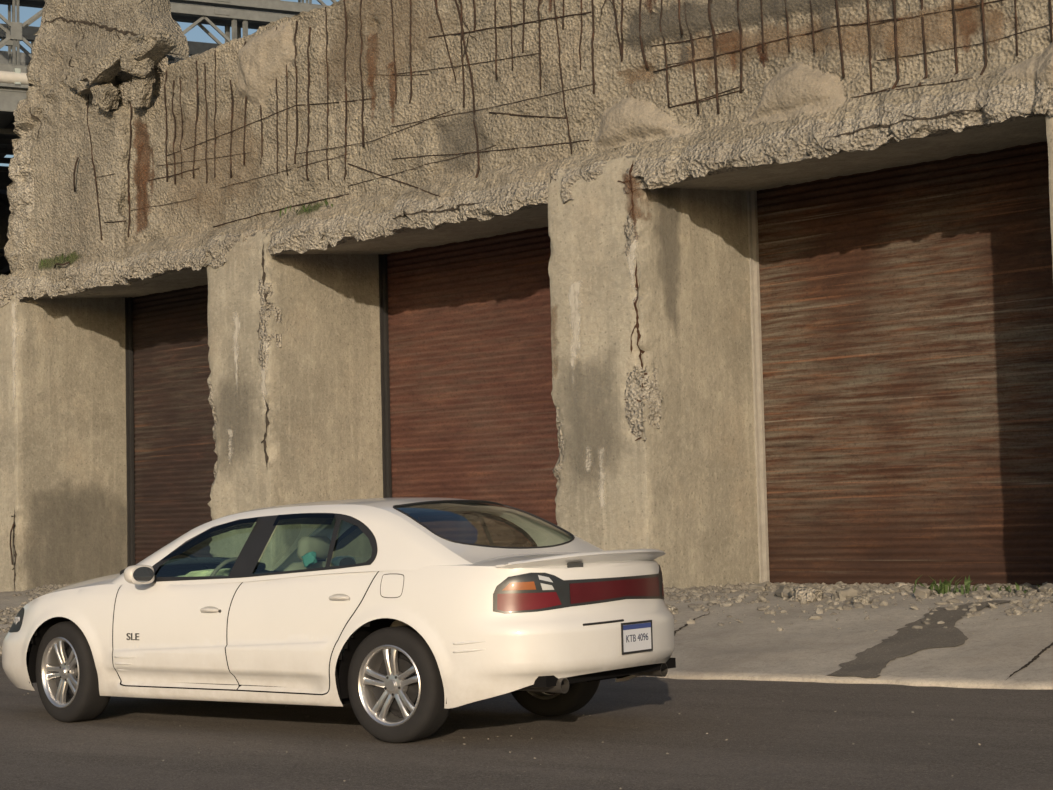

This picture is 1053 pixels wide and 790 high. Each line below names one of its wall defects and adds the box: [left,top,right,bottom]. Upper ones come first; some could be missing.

crack [41,17,140,78]
spalling [612,0,624,62]
water stain [627,0,851,62]
spalling [639,0,1053,114]
spalling [64,0,596,240]
crack [831,104,987,137]
corrosion [134,122,155,231]
crack [258,244,269,332]
crack [624,257,648,402]
crack [261,398,271,467]
spalling [624,364,663,442]
crack [1006,642,1053,680]